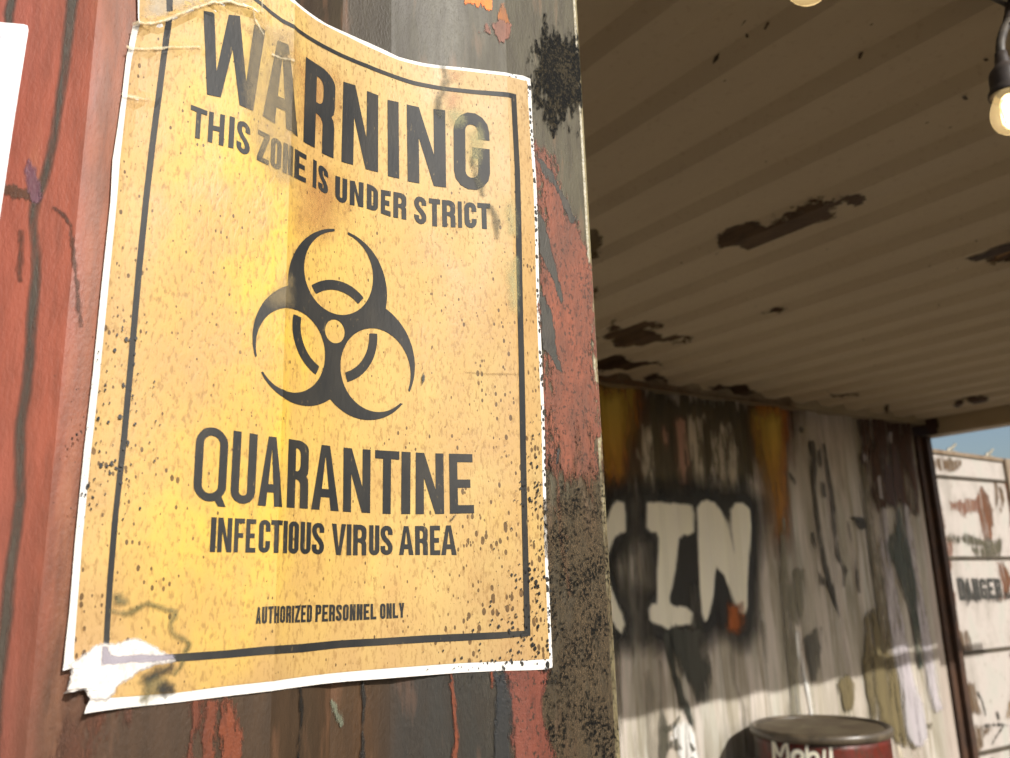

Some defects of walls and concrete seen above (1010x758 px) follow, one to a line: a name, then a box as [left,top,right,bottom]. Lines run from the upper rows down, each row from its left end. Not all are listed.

peeling [464,0,512,43]
peeling [590,230,603,259]
peeling [716,194,866,254]
peeling [596,320,693,382]
rust [534,141,792,542]
peeling [708,384,755,396]